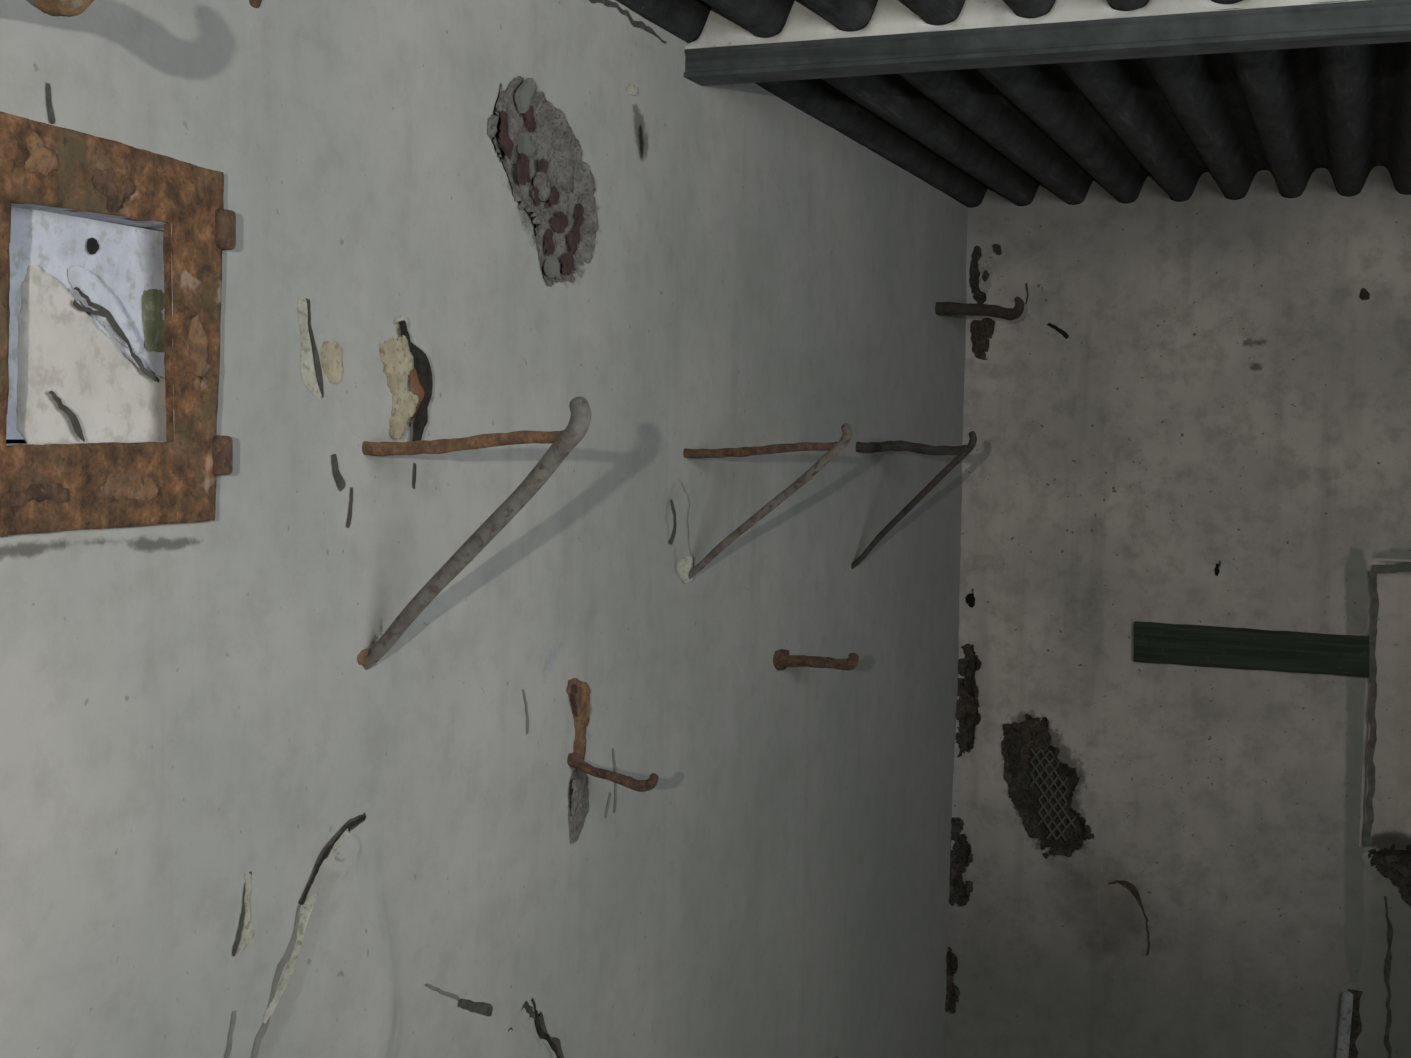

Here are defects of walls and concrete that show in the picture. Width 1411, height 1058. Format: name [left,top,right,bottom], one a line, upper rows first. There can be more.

spalling [488,76,598,287]
spalling [969,244,1002,360]
peeling [297,297,433,443]
peeling [331,454,353,528]
rust [357,636,376,666]
spalling [955,644,982,757]
spalling [1001,714,1094,859]
spalling [949,817,973,906]
spalling [1368,849,1411,907]
crack [224,813,366,1058]
crack [425,984,564,1058]